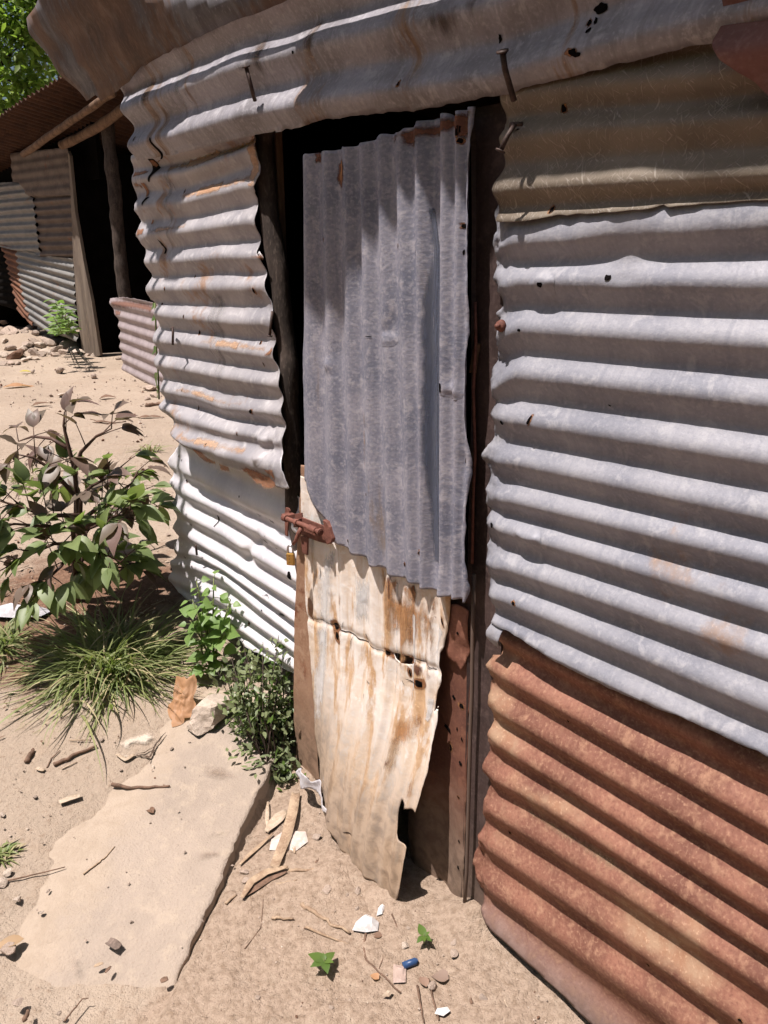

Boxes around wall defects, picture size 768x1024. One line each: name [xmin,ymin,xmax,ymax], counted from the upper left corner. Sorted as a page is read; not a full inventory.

rust [394,111,468,145]
rust [169,138,259,197]
rust [216,341,272,367]
rust [384,577,444,690]
rust [386,721,421,767]